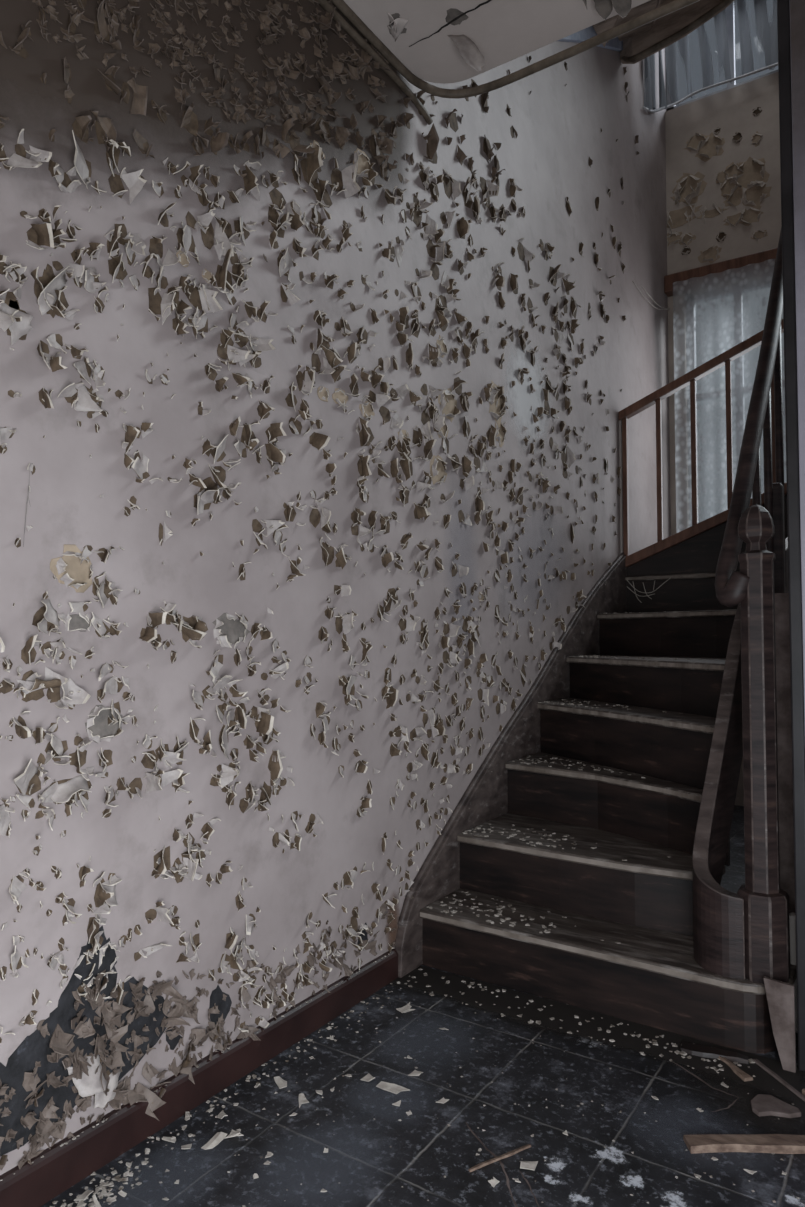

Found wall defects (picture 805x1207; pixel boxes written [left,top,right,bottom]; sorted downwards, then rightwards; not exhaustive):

crack [409,0,492,47]
peeling [666,128,772,263]
peeling [0,0,632,1171]